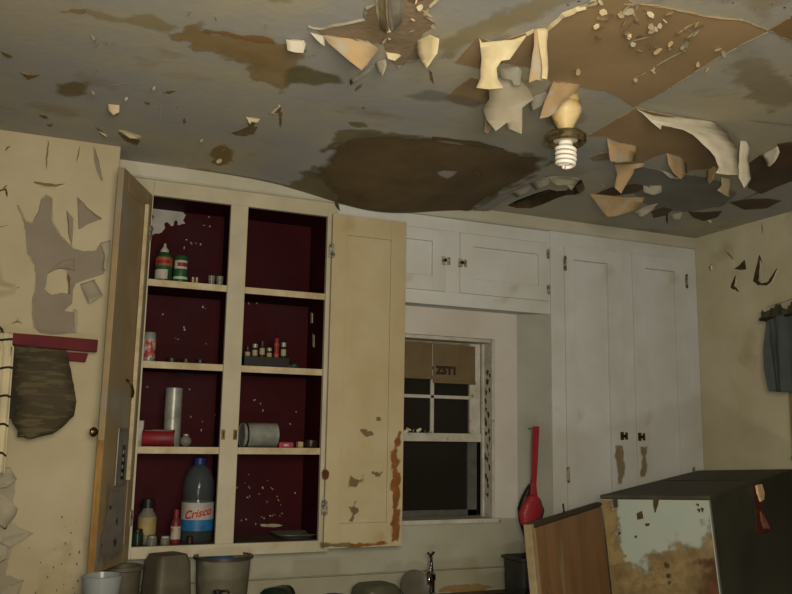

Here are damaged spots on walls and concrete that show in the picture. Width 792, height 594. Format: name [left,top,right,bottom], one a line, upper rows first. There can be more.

damp [58,82,86,96]
peeling [63,97,128,116]
peeling [118,130,141,145]
damp [63,9,340,89]
peeling [232,117,260,136]
peeling [286,39,306,53]
peeling [308,0,439,91]
damp [288,122,553,213]
peeling [445,0,792,226]
peeling [17,194,111,335]
crack [708,252,792,307]
peeling [0,467,33,594]